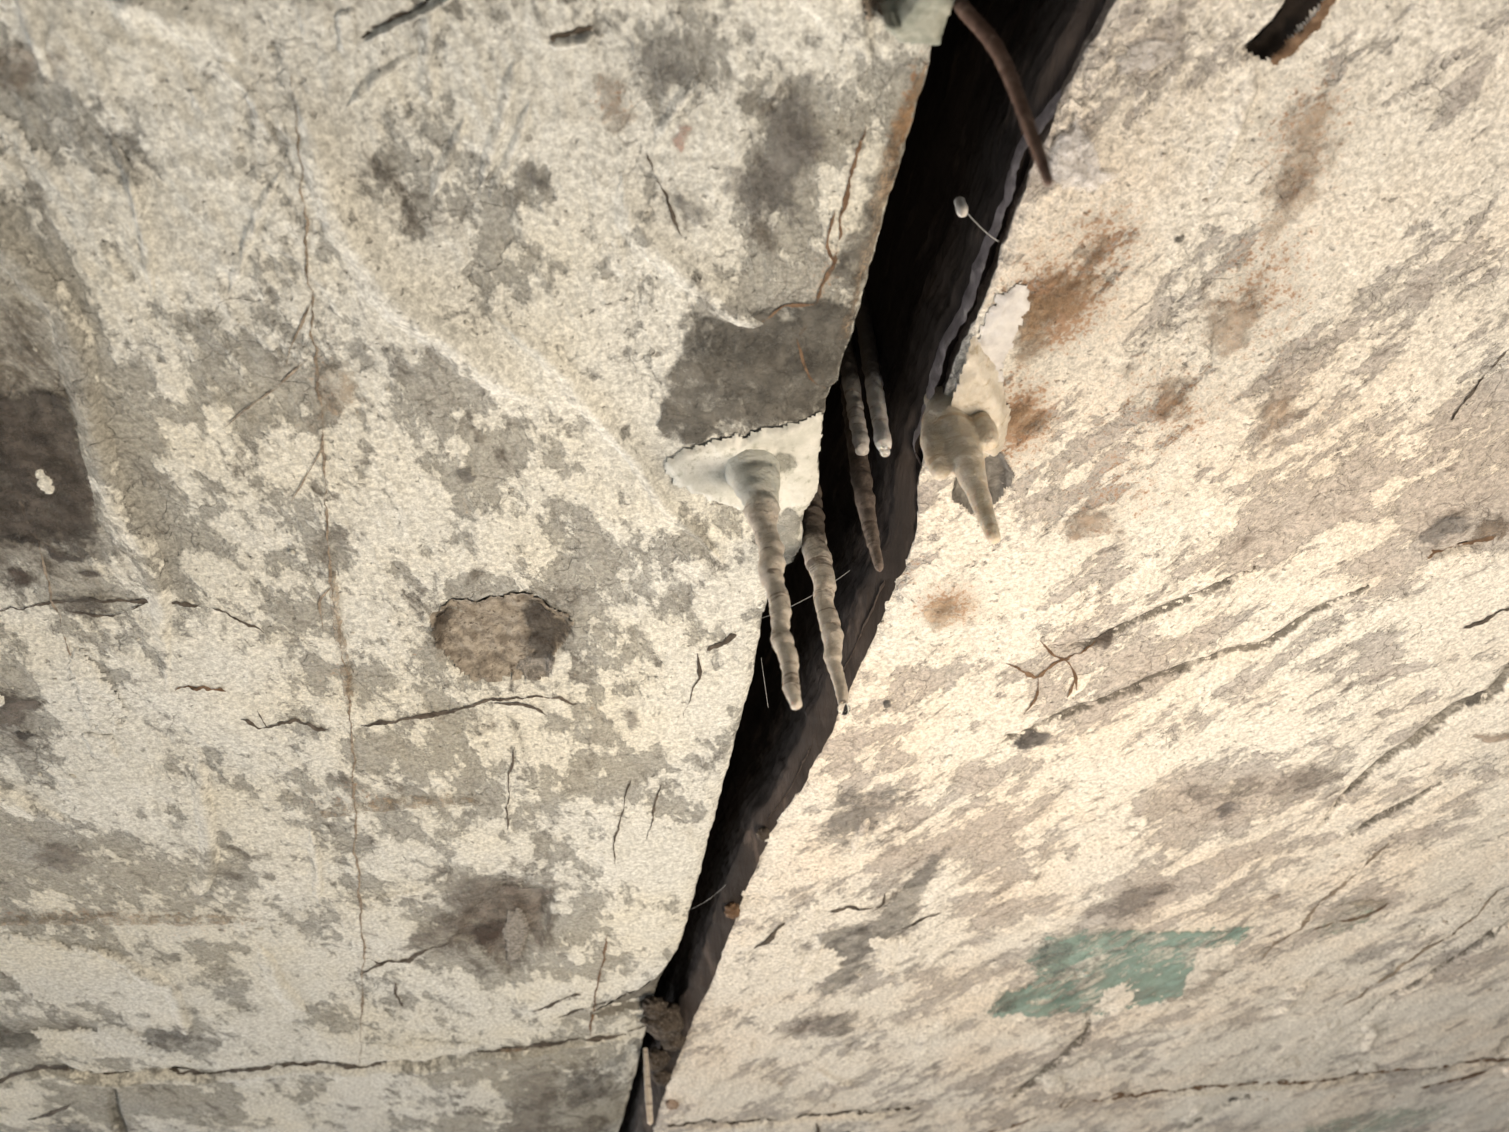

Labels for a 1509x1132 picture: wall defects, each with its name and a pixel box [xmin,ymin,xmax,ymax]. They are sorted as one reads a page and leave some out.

spalling [862,0,955,46]
crack [762,126,866,389]
leakage [657,167,897,564]
leakage [951,284,1030,458]
crack [0,76,645,1120]
crack [1461,608,1509,629]
crack [683,634,737,715]
crack [1008,640,1096,714]
crack [754,923,785,949]
crack [829,894,940,930]
crack [1257,843,1389,960]
crack [989,1058,1509,1132]